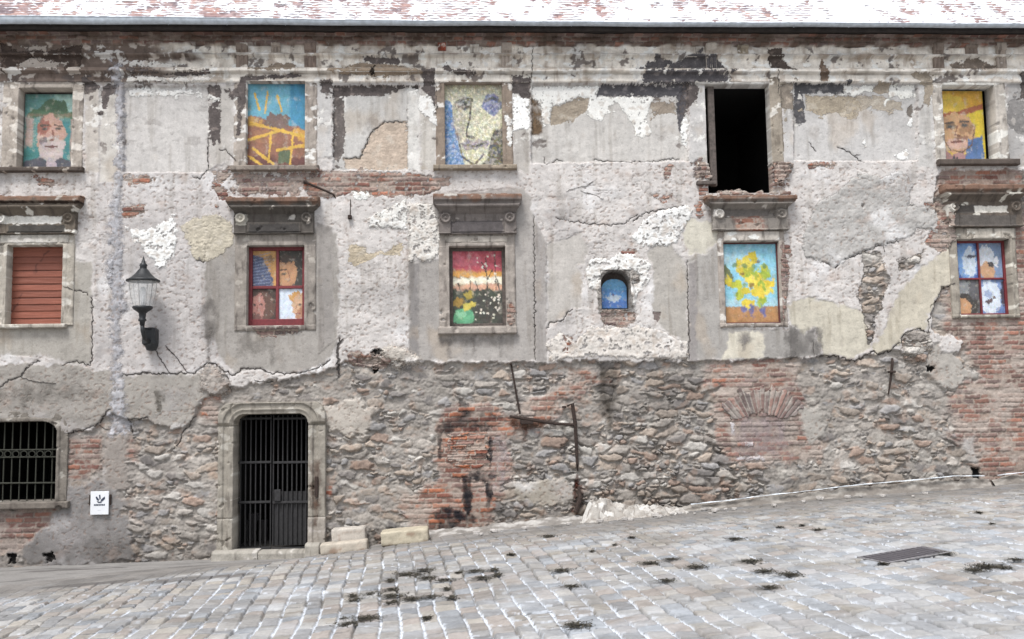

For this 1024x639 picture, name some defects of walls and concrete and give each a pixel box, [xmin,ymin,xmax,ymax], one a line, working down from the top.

peeling [0,43,302,146]
peeling [504,47,737,148]
flaking render [121,55,476,269]
peeling [585,193,704,328]
spalling [780,149,957,345]
crack [121,337,343,393]
crack [67,409,148,434]
water stain [454,477,475,523]